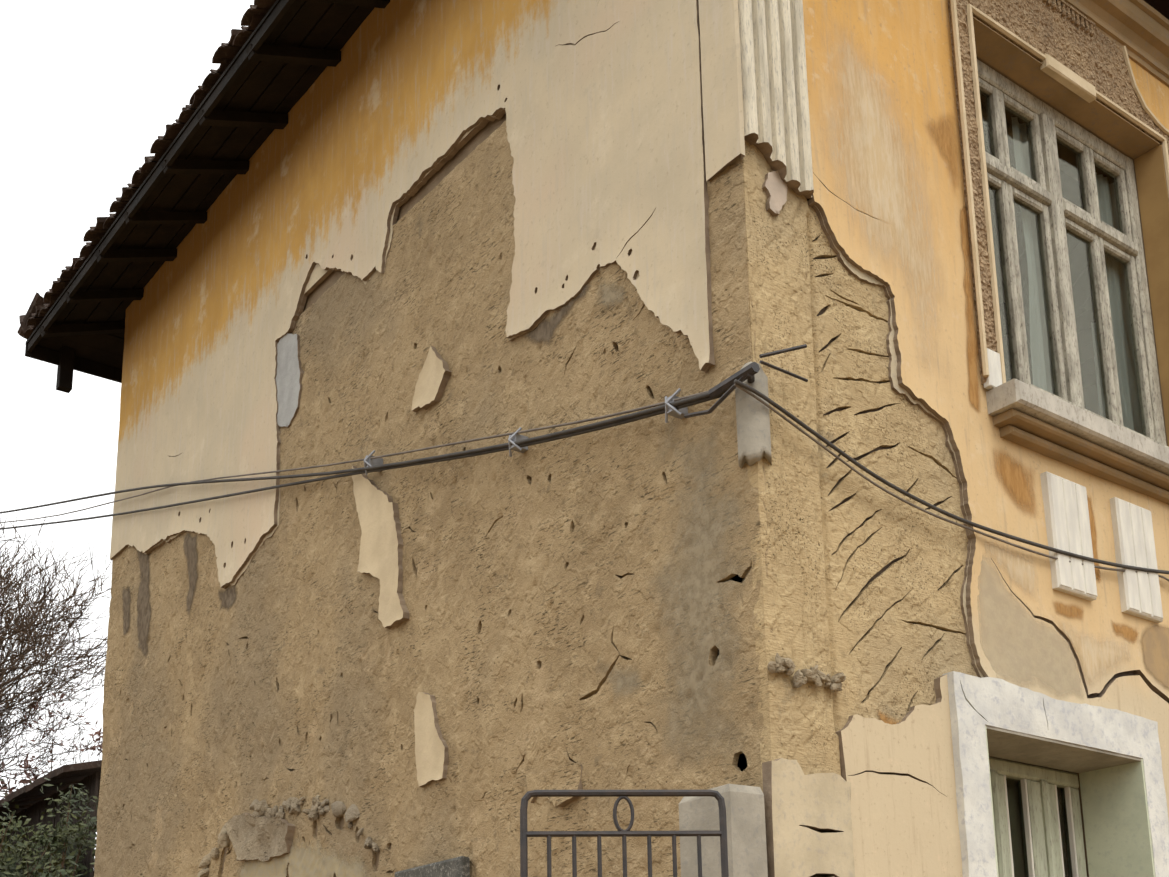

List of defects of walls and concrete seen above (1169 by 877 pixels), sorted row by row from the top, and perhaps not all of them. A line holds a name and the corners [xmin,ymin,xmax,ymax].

peeling [841,50,931,323]
leakage [527,285,587,342]
peeling [94,121,978,877]
leakage [122,551,151,656]
leakage [183,534,197,612]
leakage [219,586,236,609]
crack [1087,671,1136,698]